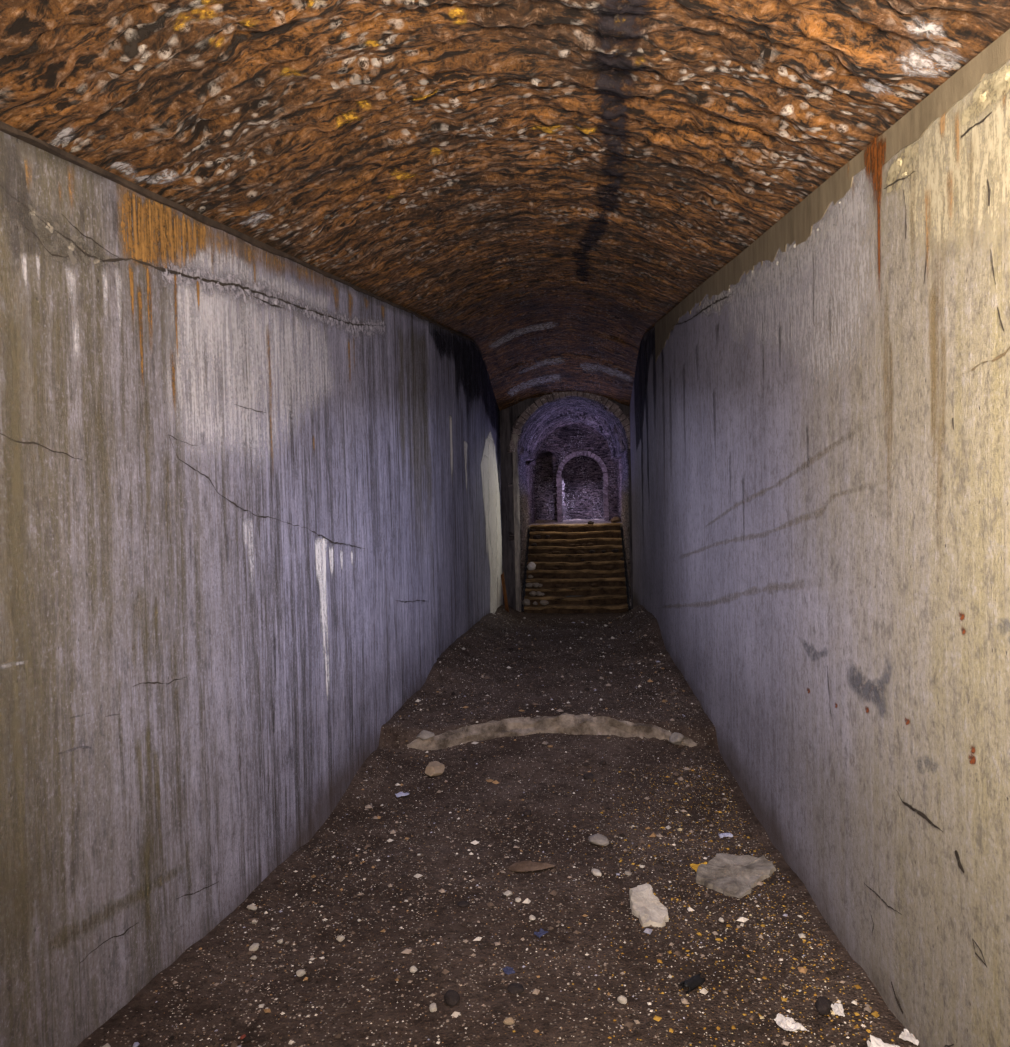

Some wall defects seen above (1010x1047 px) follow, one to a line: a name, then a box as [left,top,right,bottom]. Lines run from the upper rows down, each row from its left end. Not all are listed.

crack [0,185,384,327]
rust [118,186,368,401]
damp [174,250,331,455]
damp [572,0,659,281]
rust [864,137,886,286]
crack [971,251,1010,371]
crack [168,434,364,549]
damp [400,322,564,613]
damp [315,538,353,695]